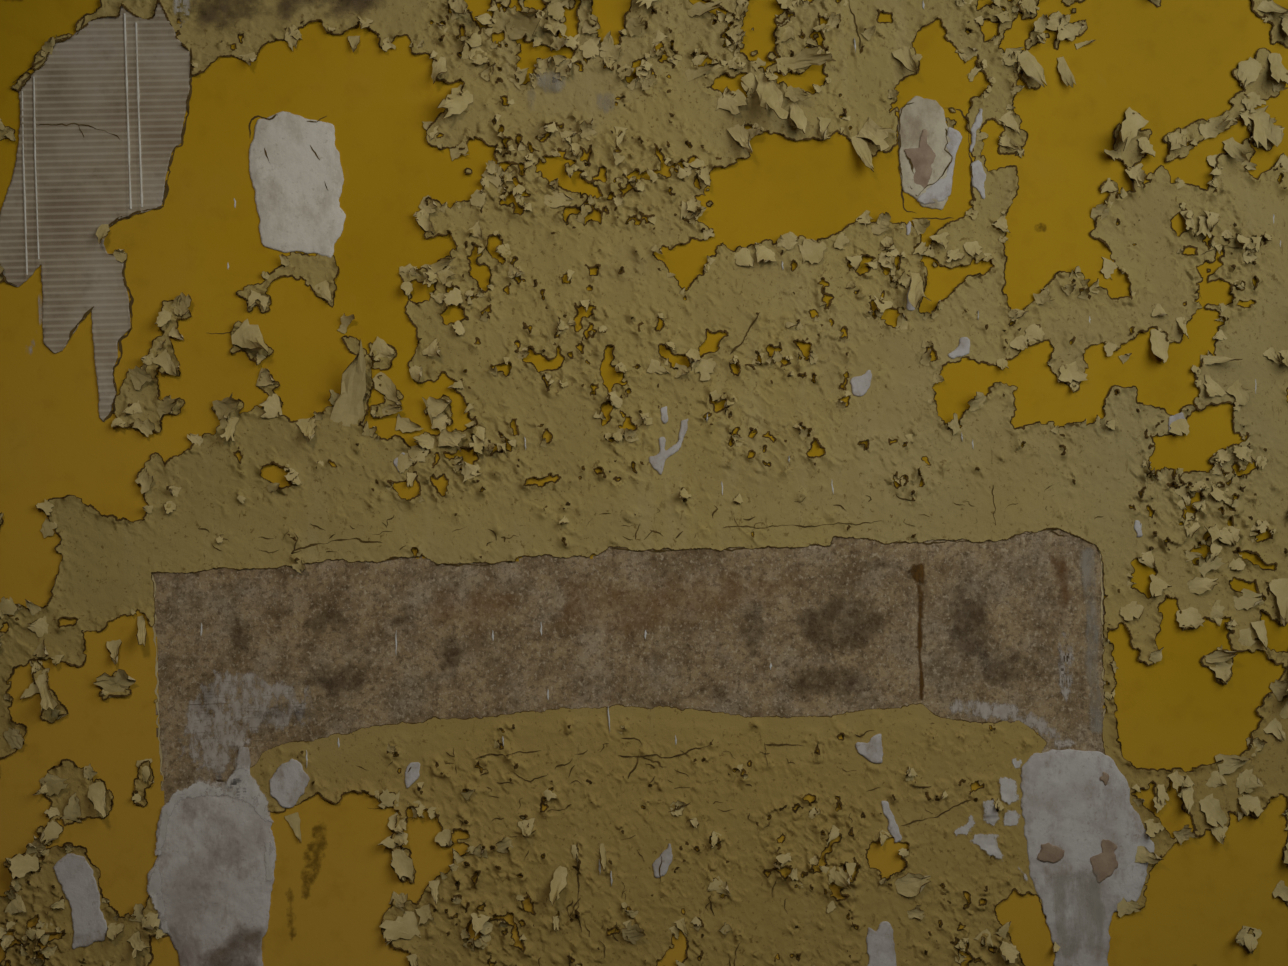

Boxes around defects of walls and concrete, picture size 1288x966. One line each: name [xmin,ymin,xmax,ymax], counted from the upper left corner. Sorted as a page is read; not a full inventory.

peeling [0,0,202,422]
peeling [96,8,502,537]
peeling [359,389,591,552]
flaking render [0,466,1118,966]
peeling [401,0,1019,495]
peeling [845,418,958,514]
peeling [717,0,1288,420]
water stain [950,700,1074,748]
peeling [910,175,1288,966]